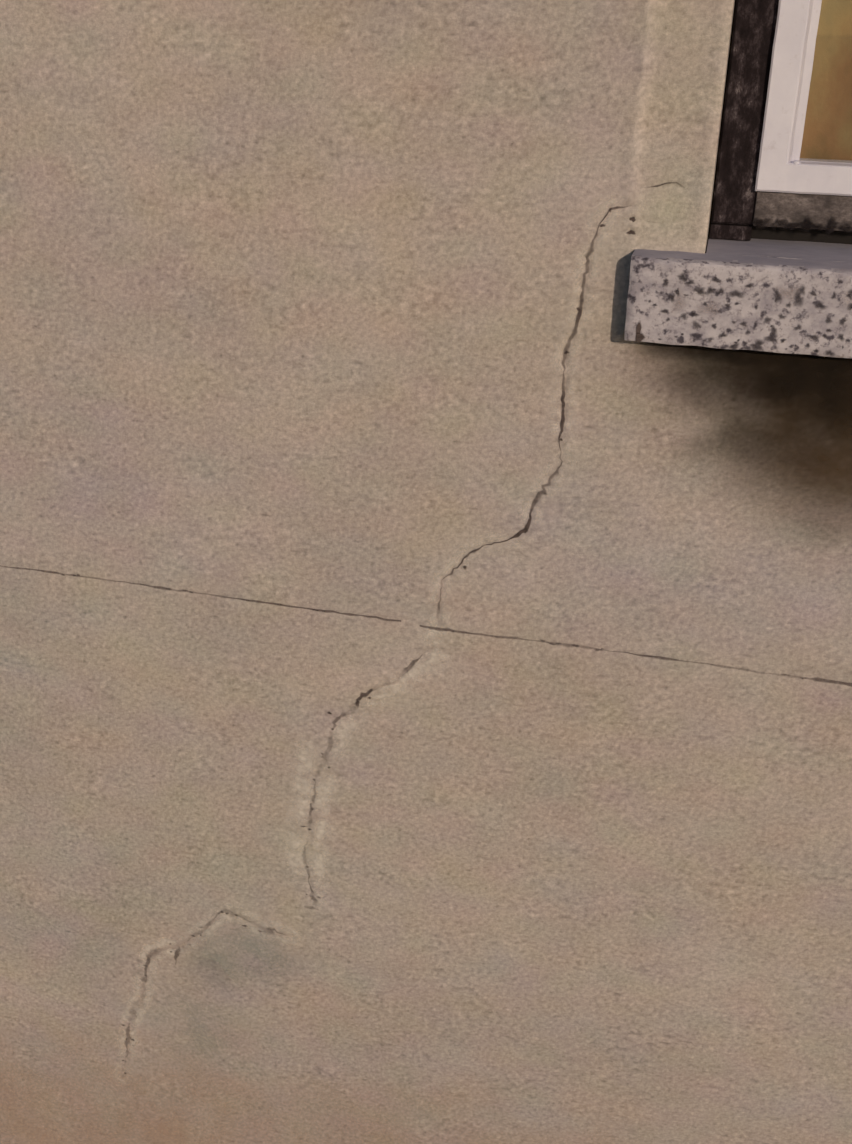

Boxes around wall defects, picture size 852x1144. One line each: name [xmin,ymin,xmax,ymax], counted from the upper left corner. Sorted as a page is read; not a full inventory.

crack [587,206,621,263]
crack [565,293,583,354]
crack [557,384,565,450]
crack [5,566,81,577]
crack [119,581,193,593]
crack [440,492,542,595]
crack [227,597,678,661]
crack [812,678,852,686]
crack [314,689,373,781]
crack [144,935,201,976]